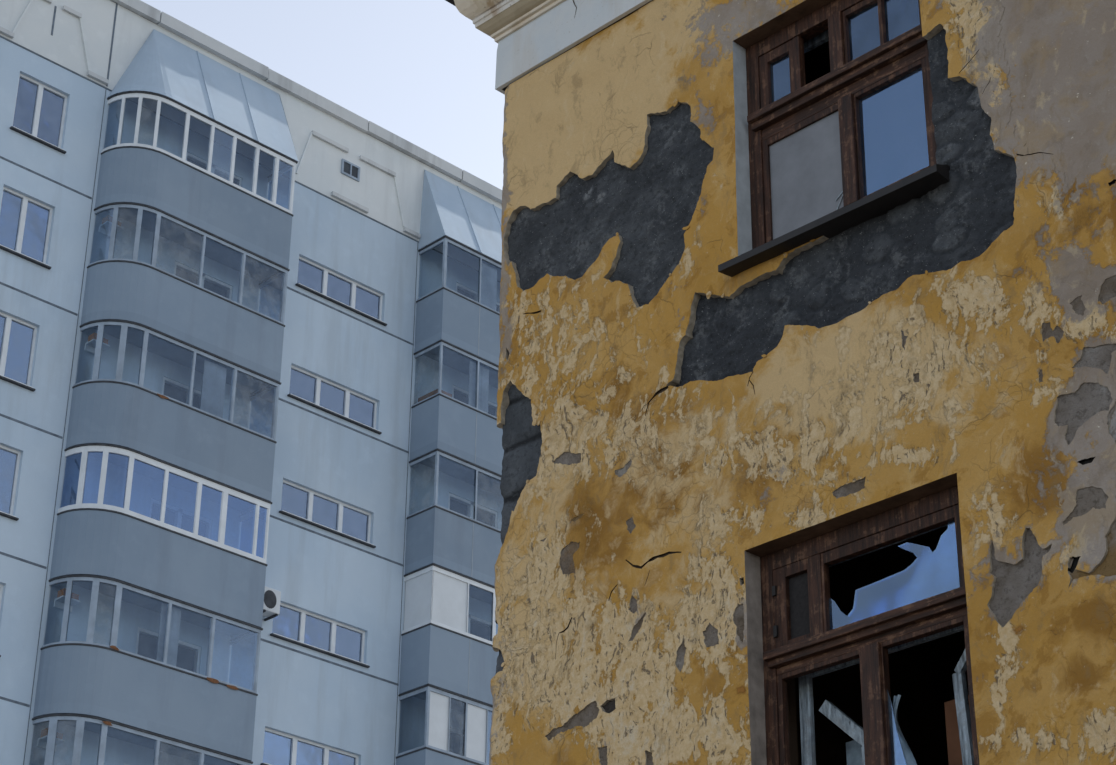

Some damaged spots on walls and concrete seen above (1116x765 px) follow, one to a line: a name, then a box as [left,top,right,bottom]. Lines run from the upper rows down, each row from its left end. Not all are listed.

spalling [503,98,714,308]
spalling [666,24,1017,387]
peeling [1041,322,1064,343]
peeling [1070,295,1086,316]
peeling [1098,275,1116,304]
peeling [1054,343,1116,445]
spalling [497,381,542,545]
peeling [553,451,581,465]
crack [608,551,681,601]
peeling [987,527,1052,628]
peeling [1062,486,1116,589]